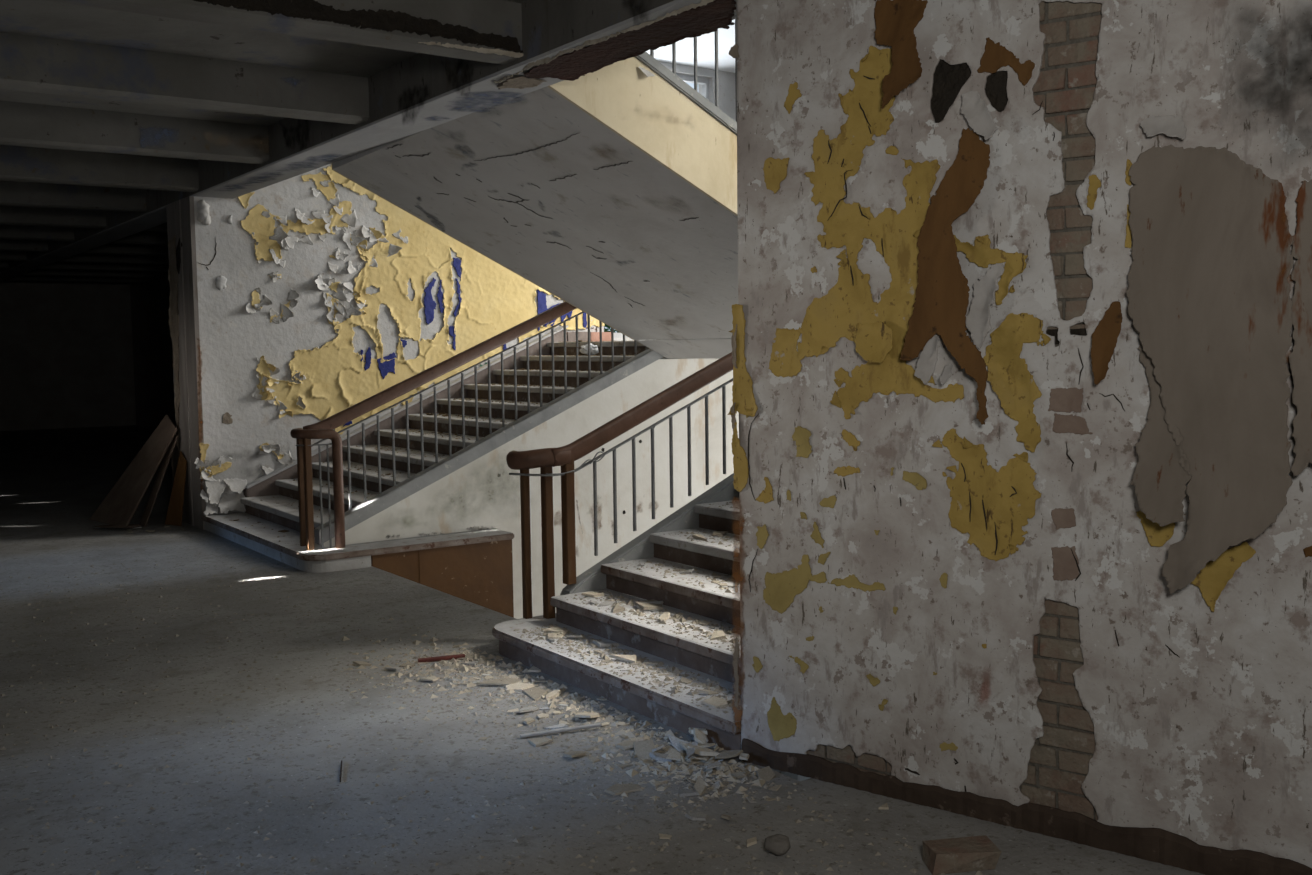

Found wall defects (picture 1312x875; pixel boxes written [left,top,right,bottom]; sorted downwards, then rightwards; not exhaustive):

spalling [729,44,739,59]
peeling [168,235,182,483]
peeling [195,443,232,481]
peeling [259,443,293,475]
peeling [238,165,605,435]
peeling [797,0,1312,612]
flaking render [1021,599,1098,821]